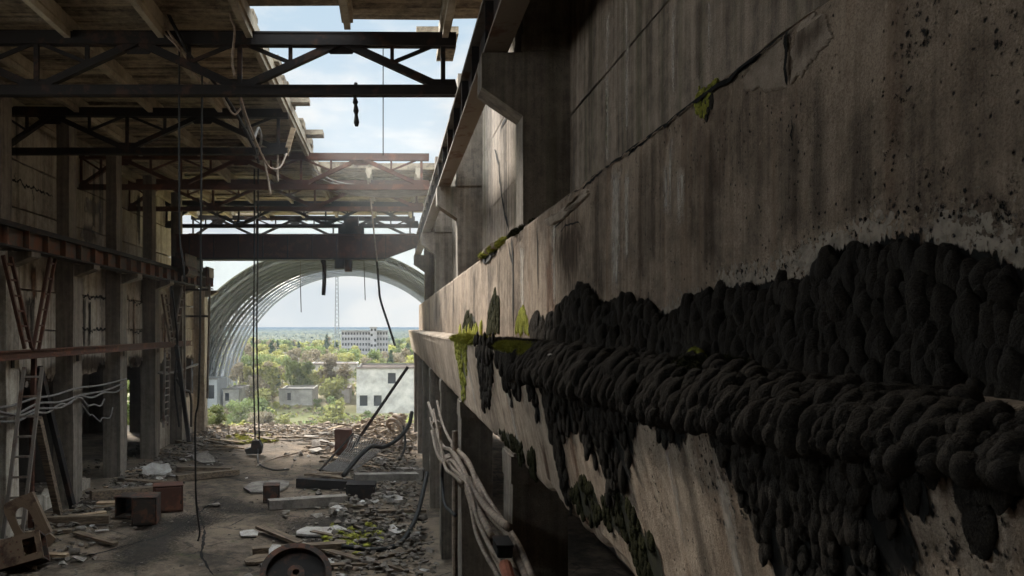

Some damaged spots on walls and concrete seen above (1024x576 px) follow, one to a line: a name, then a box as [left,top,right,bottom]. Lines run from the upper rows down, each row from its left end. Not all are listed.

crack [565,26,794,197]
peeling [726,7,834,93]
leakage [659,167,1024,314]
leakage [699,435,748,576]
leakage [921,503,1018,576]